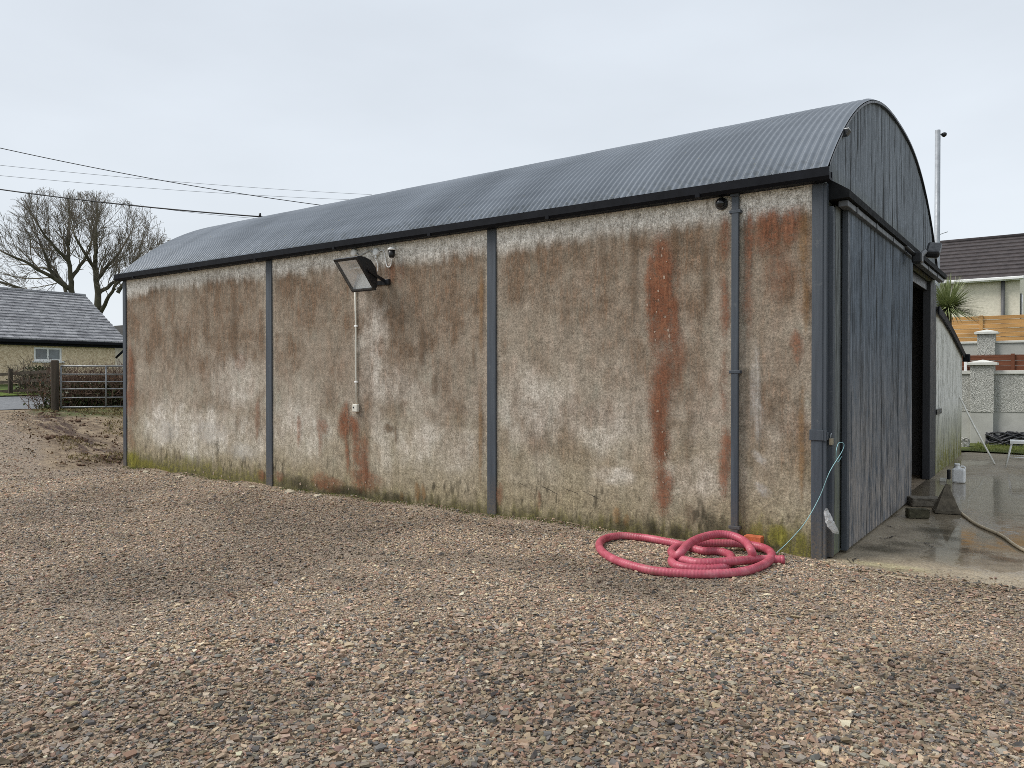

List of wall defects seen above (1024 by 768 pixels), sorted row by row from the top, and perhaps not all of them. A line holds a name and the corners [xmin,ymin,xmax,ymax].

corrosion [646,241,677,338]